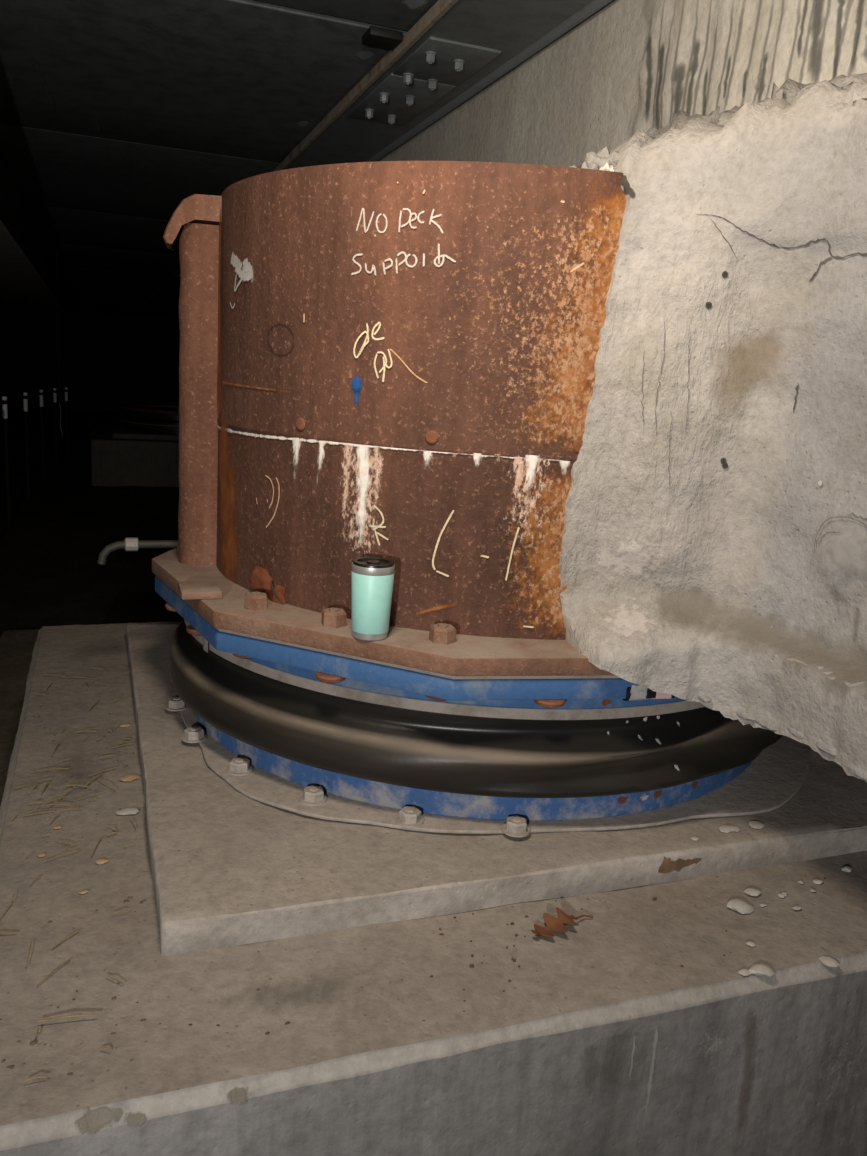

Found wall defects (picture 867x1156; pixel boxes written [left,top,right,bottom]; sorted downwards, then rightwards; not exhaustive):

damp [798,0,823,74]
damp [834,0,844,75]
damp [851,0,867,63]
damp [645,38,707,127]
crack [697,214,867,282]
corrosion [472,194,626,449]
corrosion [217,213,275,577]
efflorescence [218,426,570,552]
corrosion [249,566,286,605]
corrosion [509,473,572,634]
spalling [77,1106,146,1135]
spalling [227,1088,248,1105]